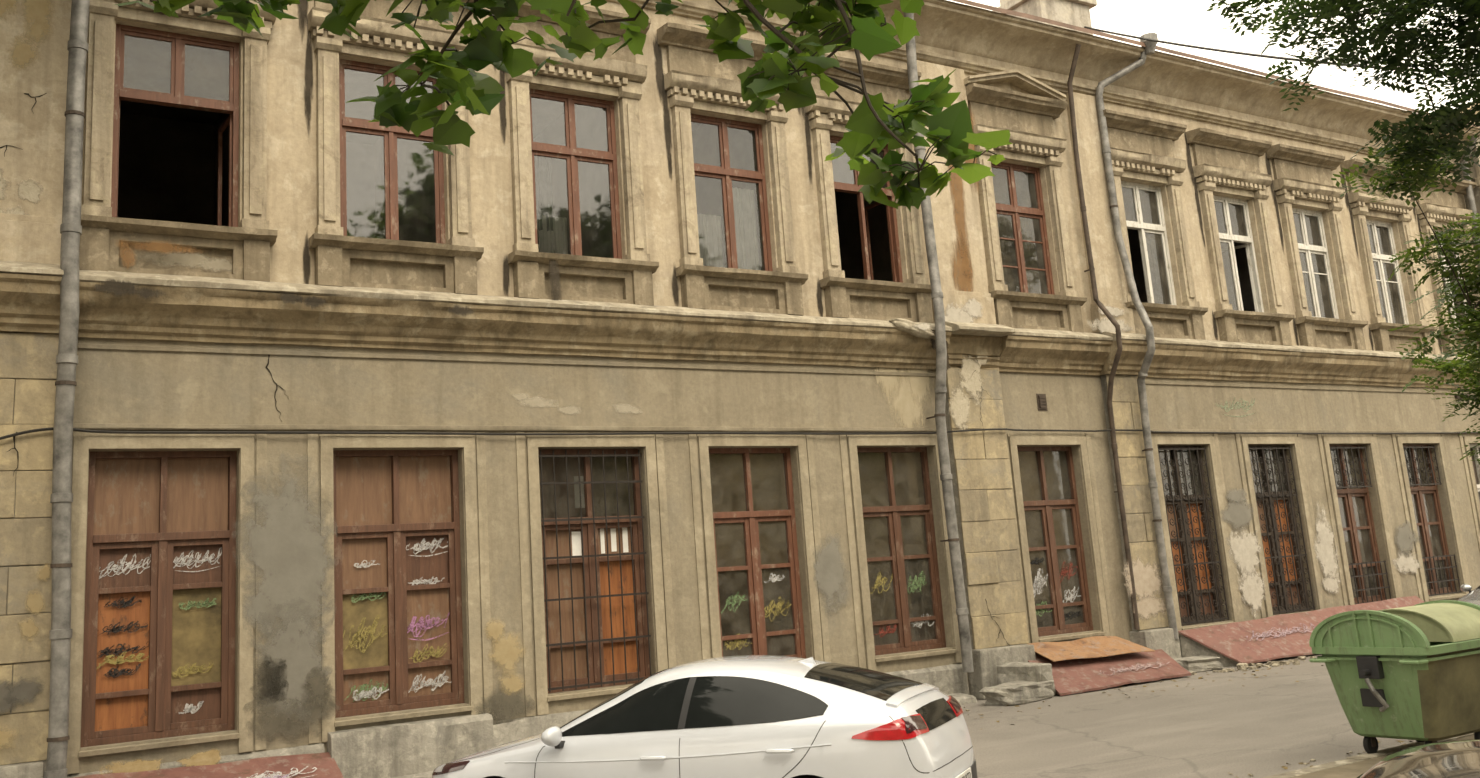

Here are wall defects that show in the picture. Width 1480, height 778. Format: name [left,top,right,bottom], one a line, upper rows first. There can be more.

peeling [945,298,982,323]
crack [265,355,287,420]
flaking render [930,339,988,430]
peeling [1228,527,1265,618]
peeling [1315,505,1340,593]
leakage [254,660,337,741]